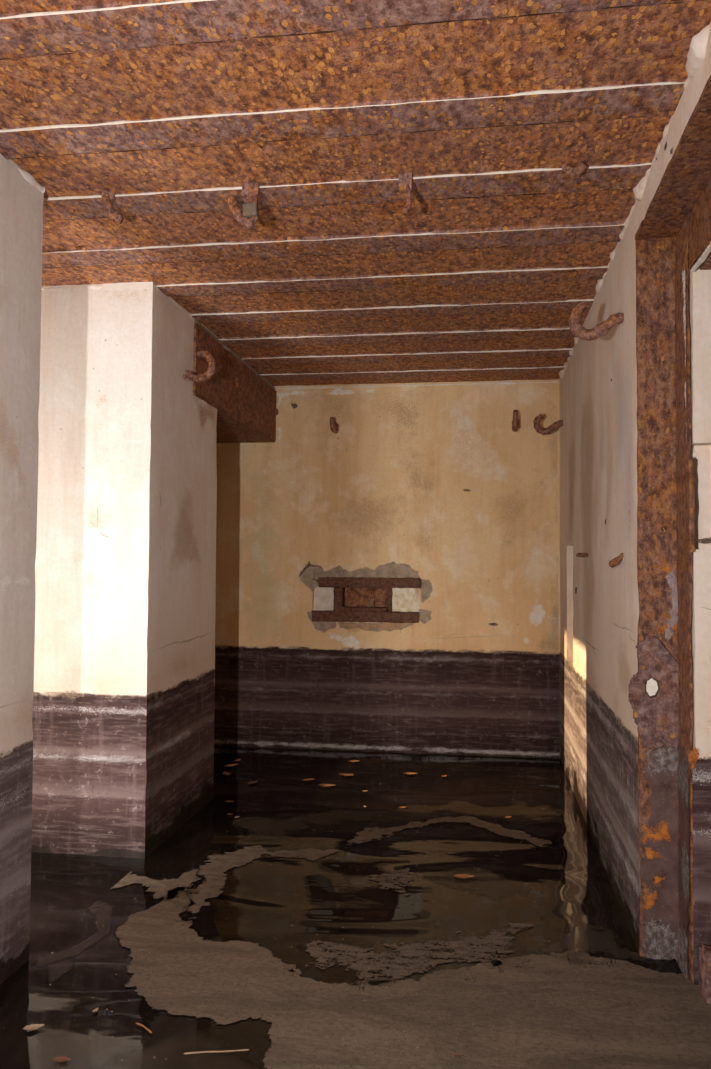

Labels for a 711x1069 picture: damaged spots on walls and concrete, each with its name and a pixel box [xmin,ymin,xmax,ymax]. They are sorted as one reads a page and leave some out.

spalling [298,561,433,633]
rust [648,562,678,641]
damp [0,339,711,985]
rust [641,821,672,860]
rust [643,876,665,909]